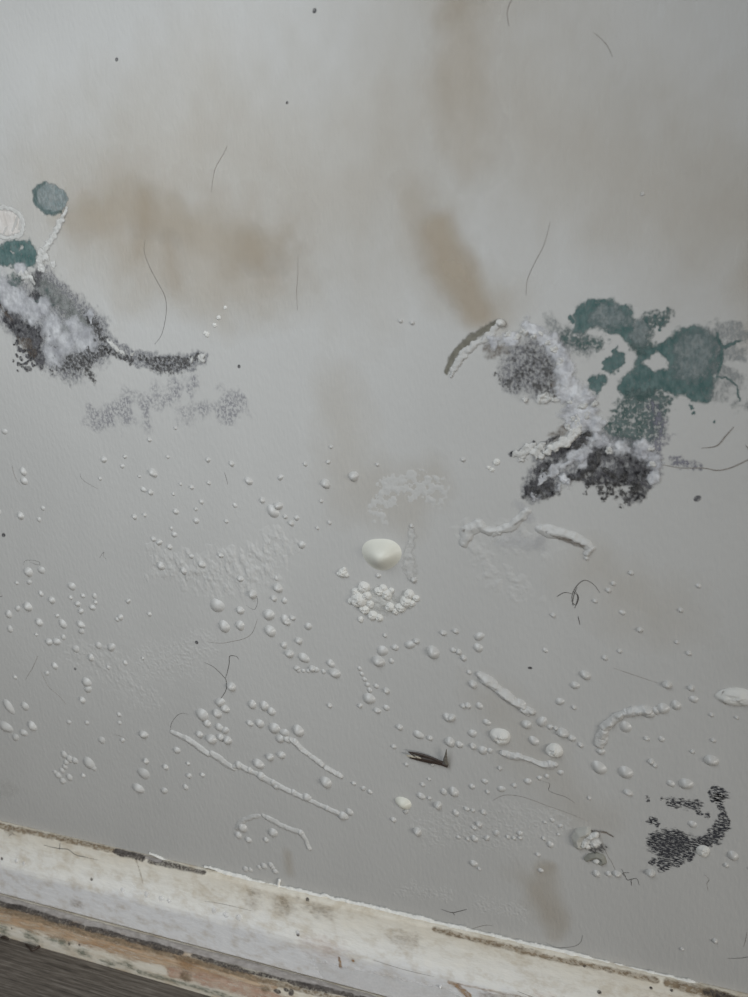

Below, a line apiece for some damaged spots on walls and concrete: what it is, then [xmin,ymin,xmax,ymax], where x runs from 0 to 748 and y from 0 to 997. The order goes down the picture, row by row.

damp [444,299,748,508]
damp [646,786,730,871]